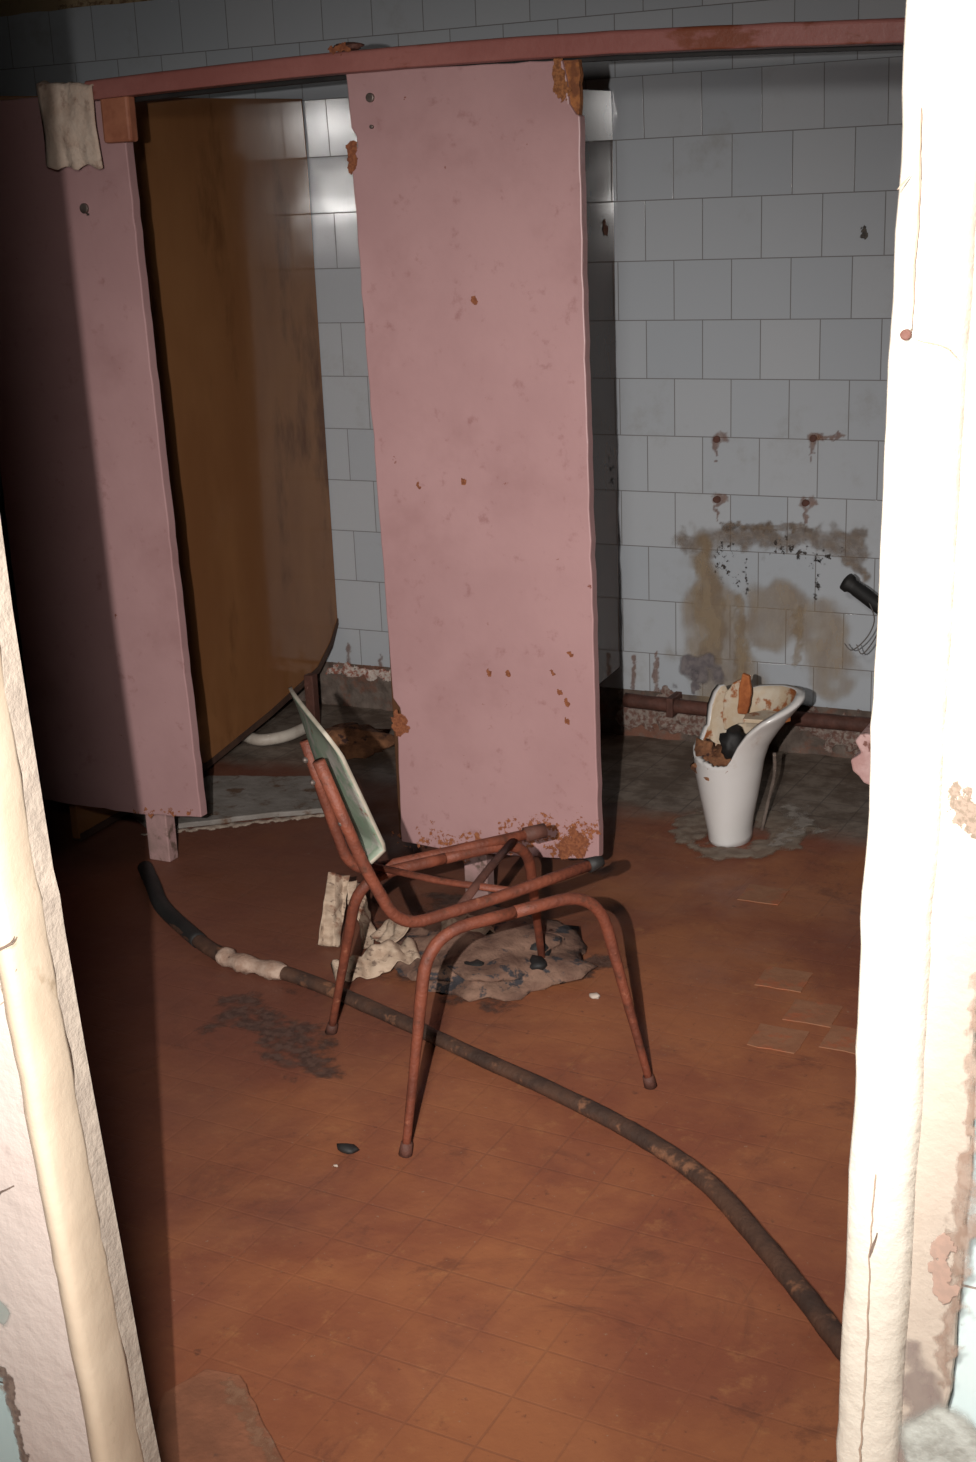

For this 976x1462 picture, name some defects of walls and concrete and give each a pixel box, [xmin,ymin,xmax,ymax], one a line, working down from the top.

rust [552,58,572,102]
damp [678,522,869,694]
rust [391,812,601,864]
spalling [947,781,976,839]
peeling [928,1003,976,1384]
peeling [0,1302,10,1325]
flaking render [0,1366,29,1462]